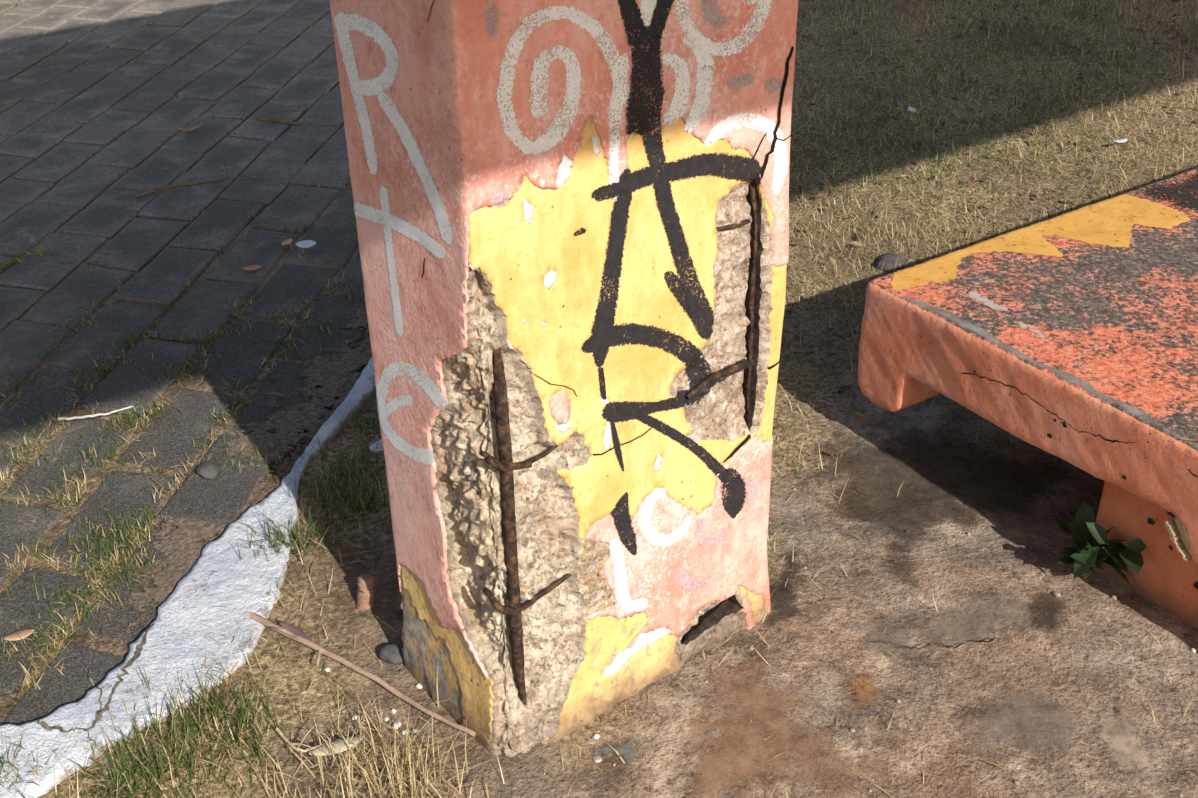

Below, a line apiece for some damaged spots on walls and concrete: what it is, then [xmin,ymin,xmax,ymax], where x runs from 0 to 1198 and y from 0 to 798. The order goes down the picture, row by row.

crack [752,46,794,186]
peeling [400,115,787,758]
crack [960,372,1135,444]
spalling [1164,511,1192,560]